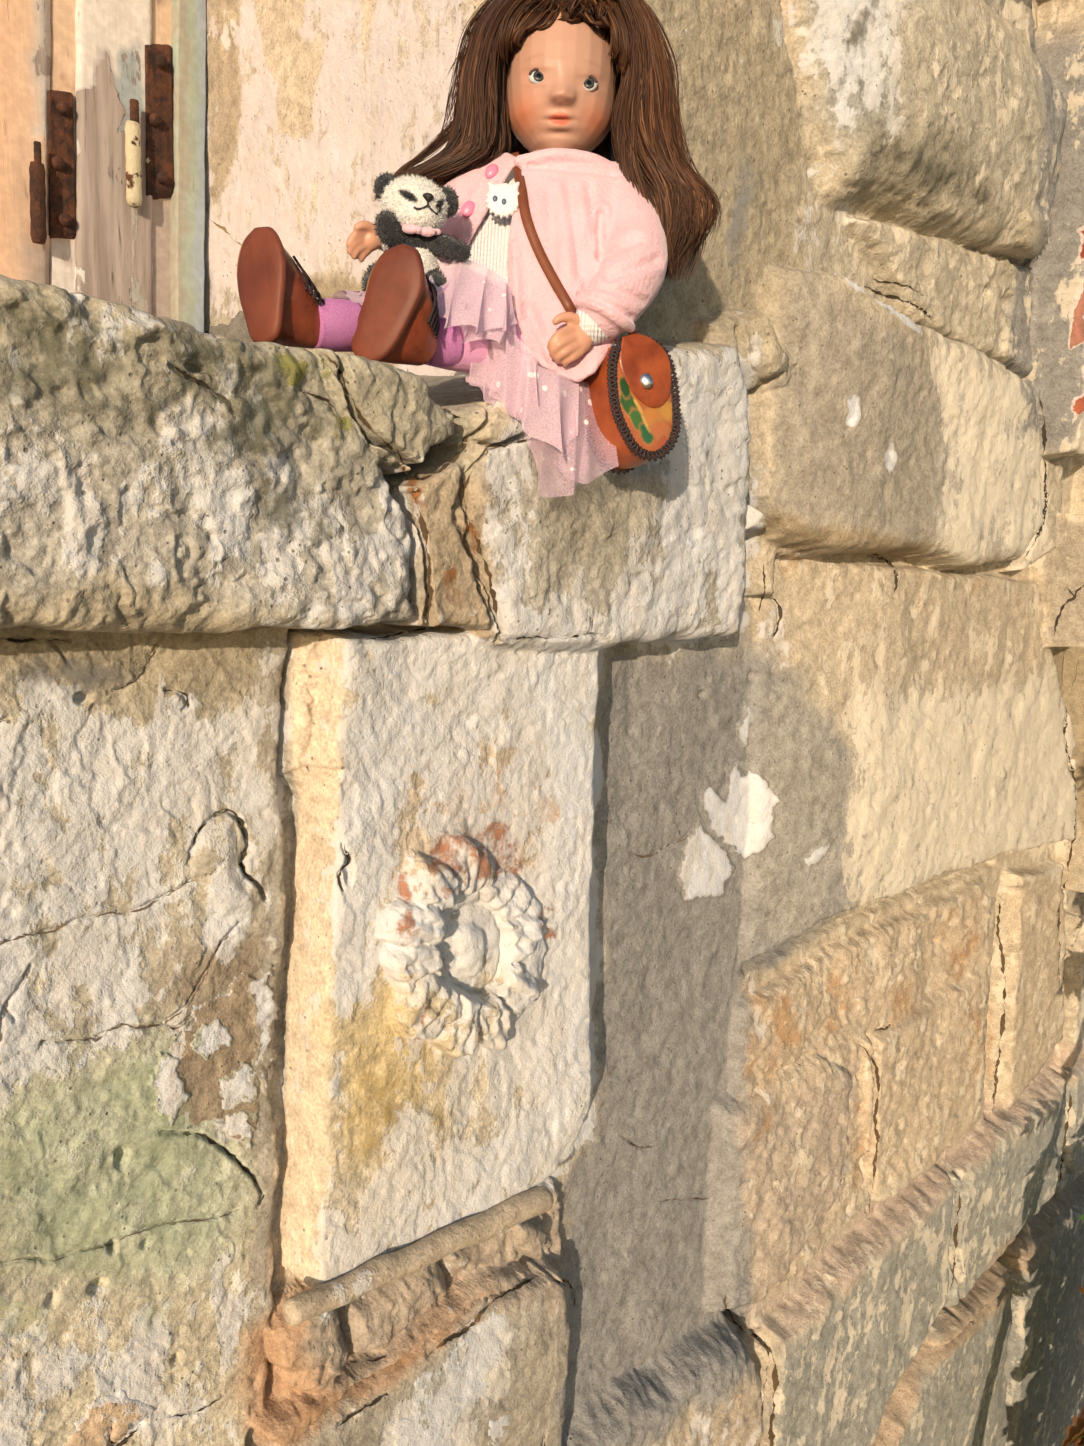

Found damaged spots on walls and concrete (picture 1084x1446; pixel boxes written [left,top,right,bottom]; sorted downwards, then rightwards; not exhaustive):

crack [174,366,235,413]
flaking render [1067,282,1084,350]
flaking render [1070,371,1084,425]
flaking render [1074,225,1084,264]
crack [305,354,598,642]
peeling [675,700,780,902]
crack [0,809,267,1043]
flaking render [145,964,280,1149]
crack [992,901,1006,1111]
crack [2,1131,265,1263]
crack [107,1427,138,1446]
crack [723,1296,779,1446]